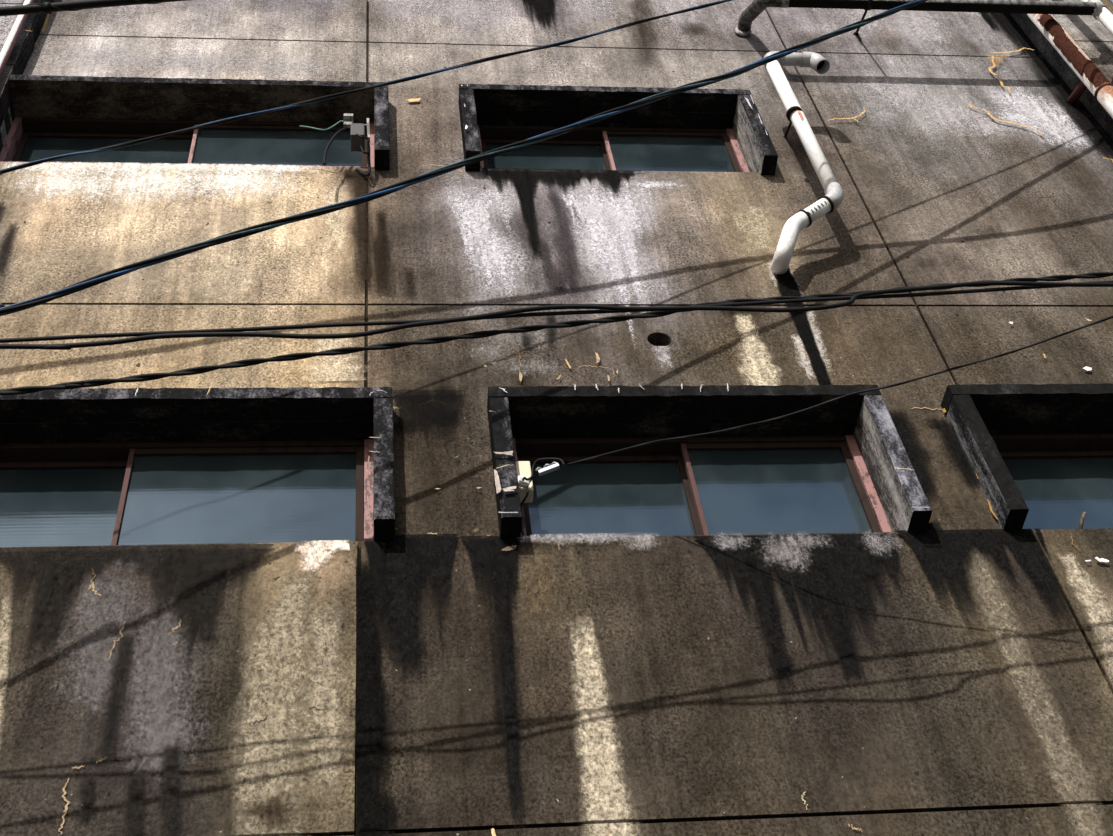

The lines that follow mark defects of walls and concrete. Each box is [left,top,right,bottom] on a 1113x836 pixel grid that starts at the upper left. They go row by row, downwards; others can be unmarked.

damp [523,0,556,25]
crack [813,108,865,132]
damp [788,0,1113,156]
crack [968,103,1043,135]
crack [988,48,1033,94]
damp [452,168,676,336]
damp [737,305,778,386]
damp [769,263,831,385]
damp [889,411,980,496]
damp [0,544,274,723]
damp [238,534,536,836]
damp [694,521,1113,836]